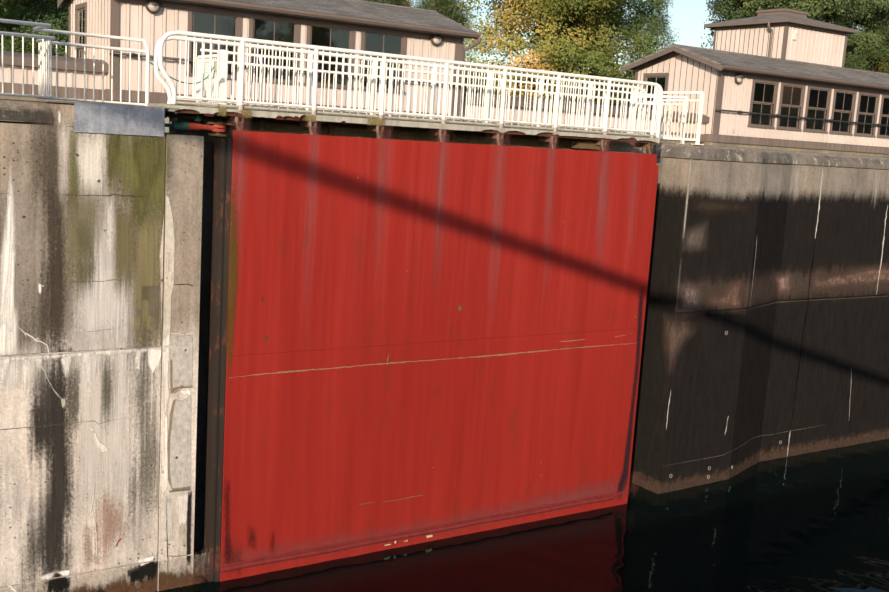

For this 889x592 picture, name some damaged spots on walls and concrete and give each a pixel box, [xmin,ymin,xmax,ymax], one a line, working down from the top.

damp [0,110,197,592]
rust [73,569,204,592]
damp [617,170,889,492]
rust [629,428,889,494]